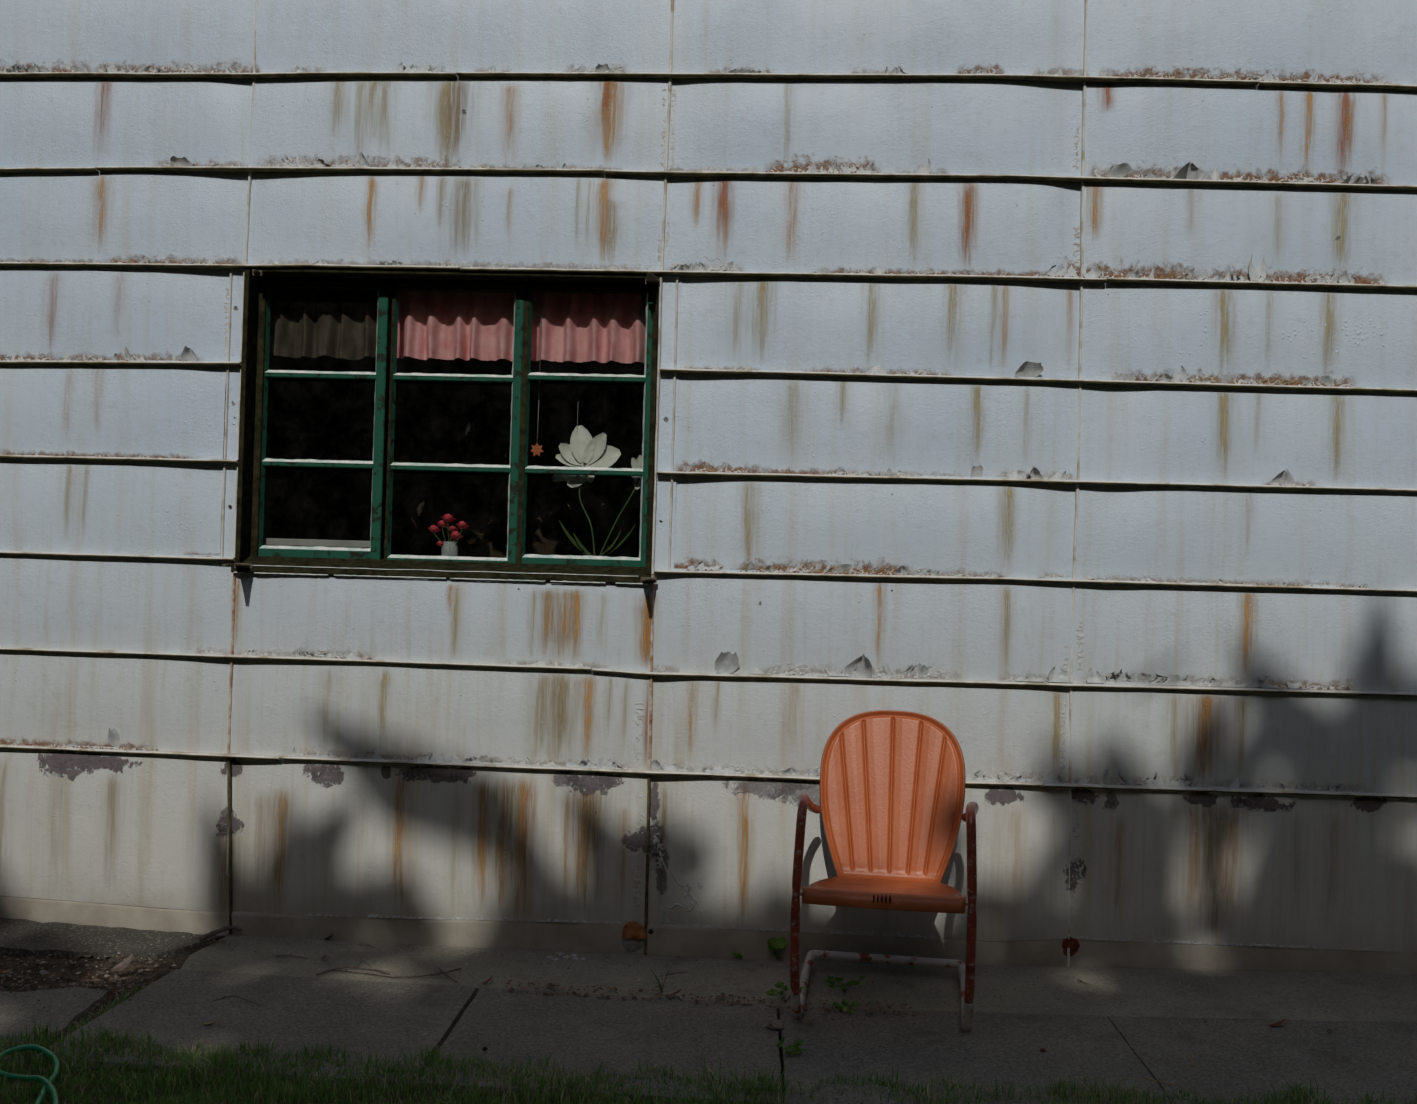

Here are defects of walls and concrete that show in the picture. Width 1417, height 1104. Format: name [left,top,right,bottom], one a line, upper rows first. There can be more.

corrosion [602,81,617,152]
corrosion [1341,91,1351,156]
peeling [1073,126,1389,185]
corrosion [600,180,615,251]
corrosion [963,190,973,249]
peeling [813,225,1386,285]
corrosion [533,593,579,642]
corrosion [642,595,651,656]
peeling [1002,615,1352,690]
peeling [0,728,158,781]
peeling [288,710,820,871]
peeling [973,768,1296,813]